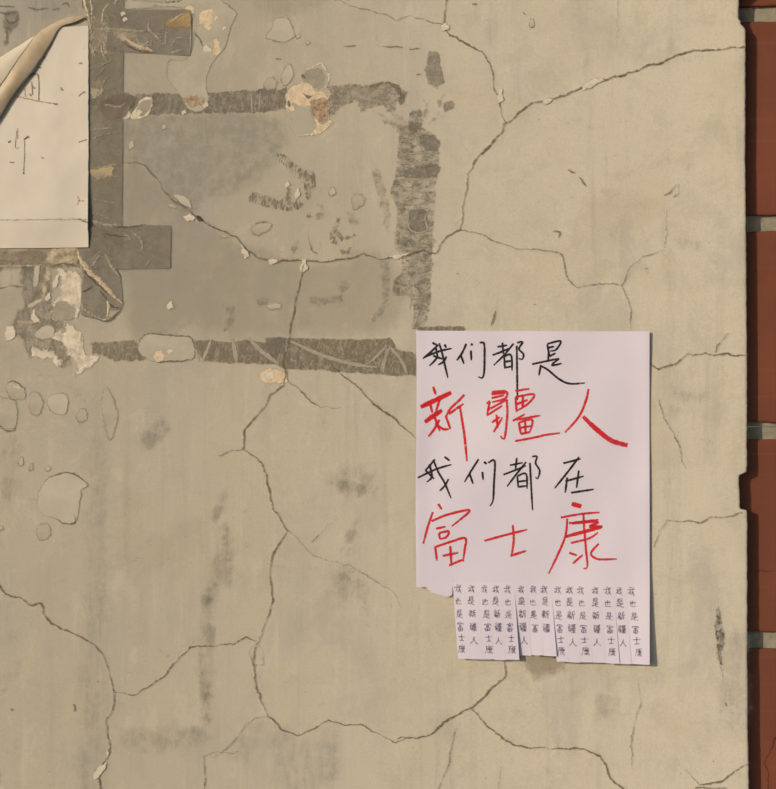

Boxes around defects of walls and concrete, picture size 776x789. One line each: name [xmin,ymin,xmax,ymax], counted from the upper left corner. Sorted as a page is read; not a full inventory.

peeling [124,0,237,115]
peeling [123,97,153,120]
flaking render [264,61,333,136]
peeling [168,194,197,222]
peeling [0,248,99,377]
peeling [138,332,195,363]
crack [171,0,748,562]
crack [0,586,205,712]
crack [224,636,261,699]
crack [253,660,531,768]
crack [557,747,624,789]
crack [694,763,750,789]